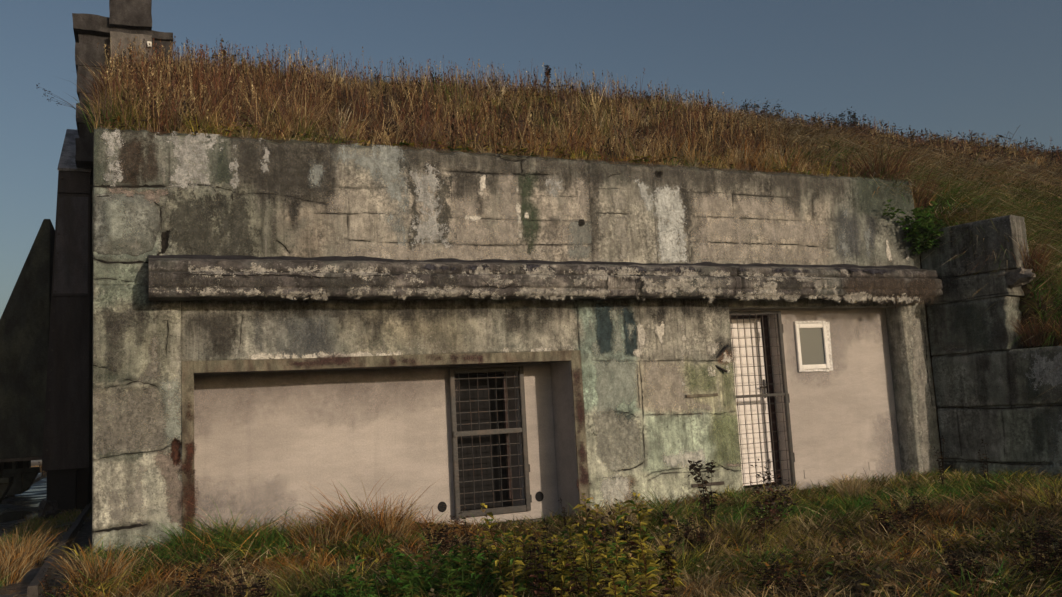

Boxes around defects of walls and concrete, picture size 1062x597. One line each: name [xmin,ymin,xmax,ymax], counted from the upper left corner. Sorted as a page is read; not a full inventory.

damp [115,132,159,185]
spalling [157,229,171,255]
damp [161,136,336,257]
damp [400,146,844,273]
peeling [177,138,932,505]
damp [593,300,730,356]
damp [691,339,733,402]
corrosion [180,440,198,534]